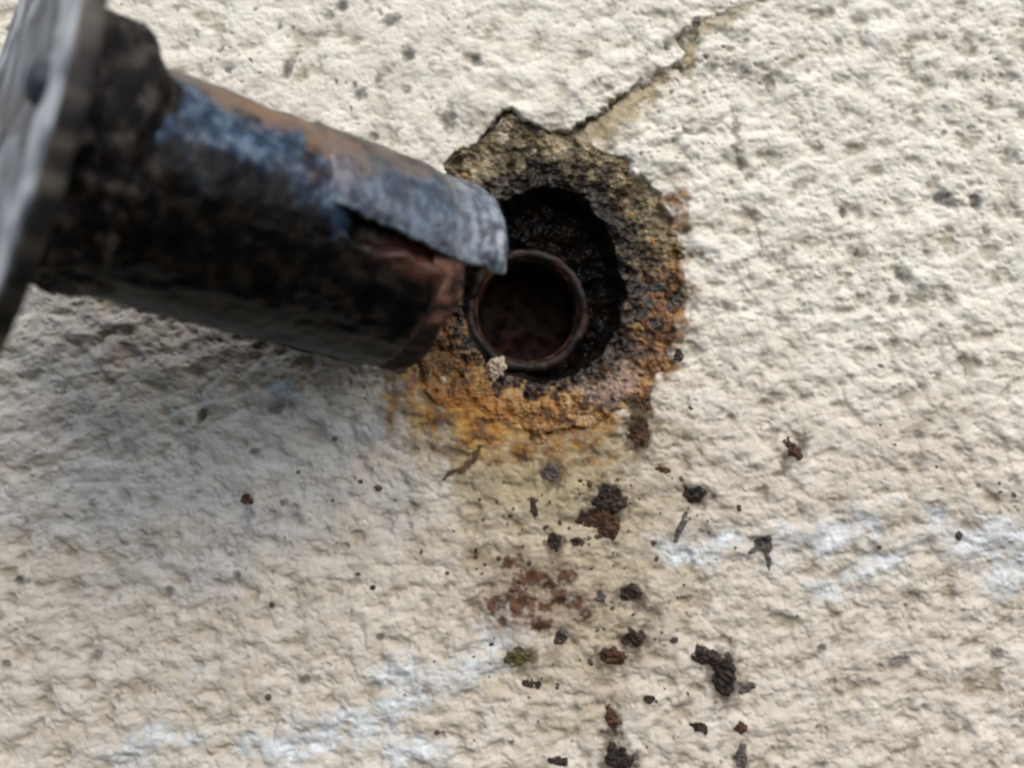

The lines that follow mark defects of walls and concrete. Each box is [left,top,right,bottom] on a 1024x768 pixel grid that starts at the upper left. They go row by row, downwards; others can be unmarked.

flaking render [680,37,697,70]
crack [705,63,798,84]
corrosion [379,251,654,556]
flaking render [417,73,685,444]